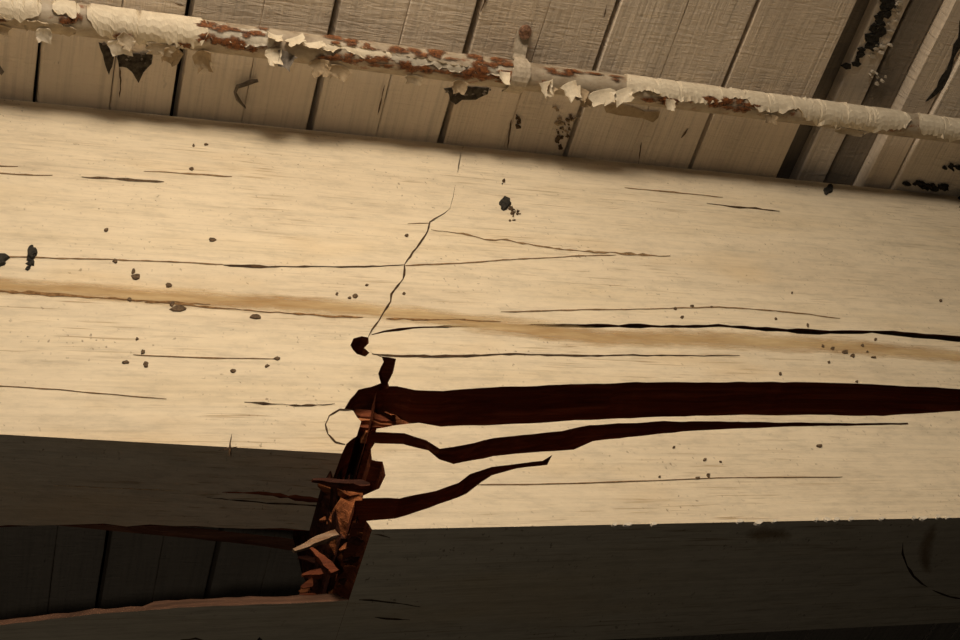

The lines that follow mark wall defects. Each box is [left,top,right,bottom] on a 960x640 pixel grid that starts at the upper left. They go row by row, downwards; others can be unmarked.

peeling [99,32,213,98]
corrosion [178,20,269,53]
peeling [265,31,351,82]
corrosion [316,35,513,83]
damp [840,0,903,86]
peeling [539,79,676,150]
corrosion [703,96,761,113]
damp [25,245,38,271]
crack [9,209,740,358]
damp [0,279,960,361]
crack [501,306,960,342]
crack [207,383,960,620]